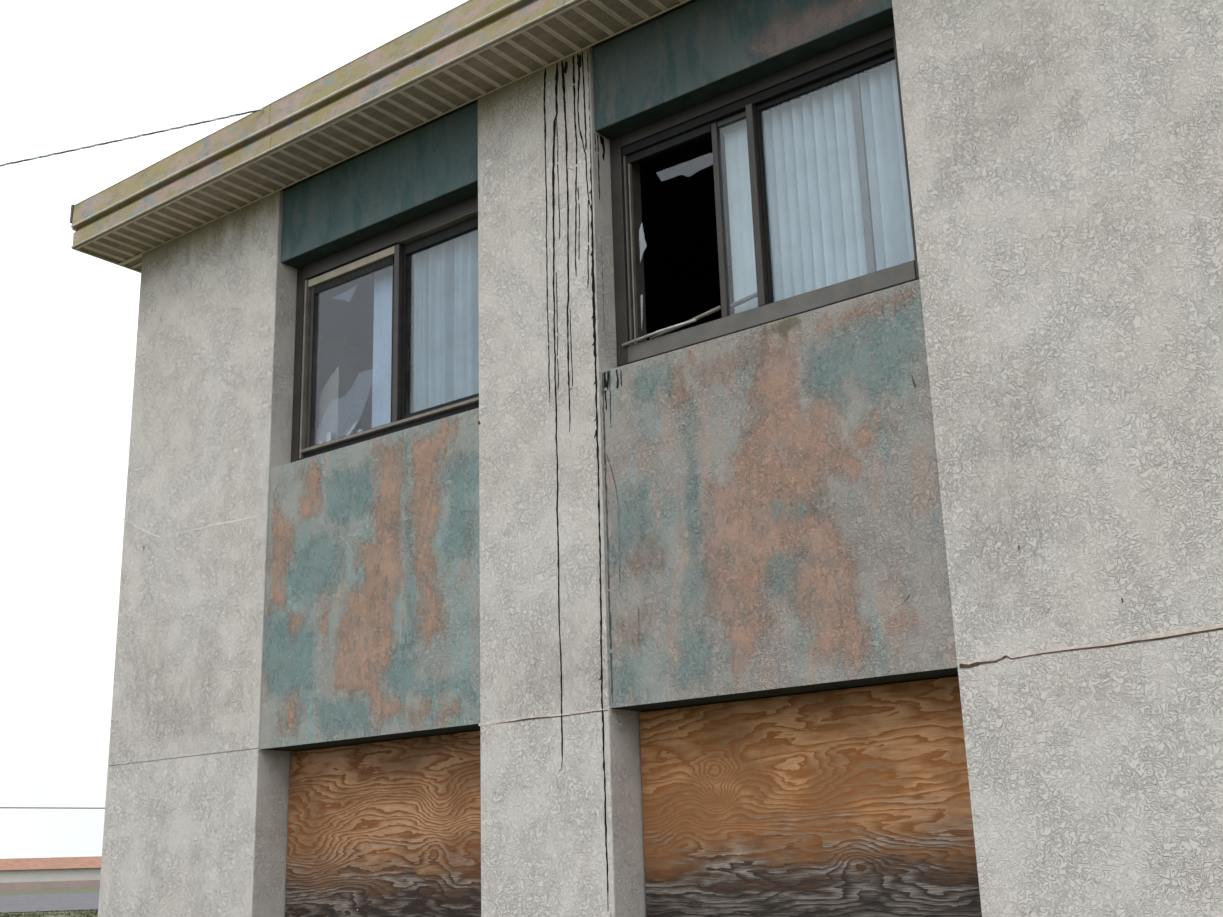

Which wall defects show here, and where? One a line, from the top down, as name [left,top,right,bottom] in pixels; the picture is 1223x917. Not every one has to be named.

damp [543,49,622,916]
crack [959,628,1223,668]